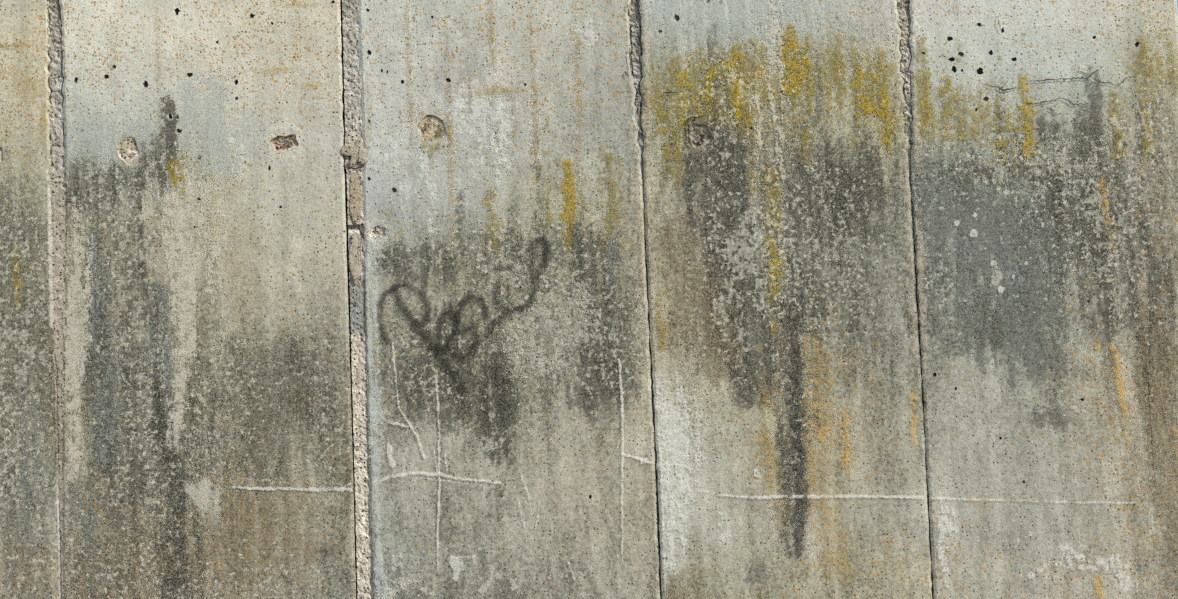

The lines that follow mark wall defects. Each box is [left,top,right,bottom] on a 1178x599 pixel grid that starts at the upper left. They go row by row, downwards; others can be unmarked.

water stain [0,173,54,596]
spalling [117,136,140,165]
water stain [62,95,344,599]
spalling [269,134,299,152]
spalling [417,109,453,162]
water stain [372,140,643,465]
water stain [663,0,1178,558]
crack [984,70,1140,119]